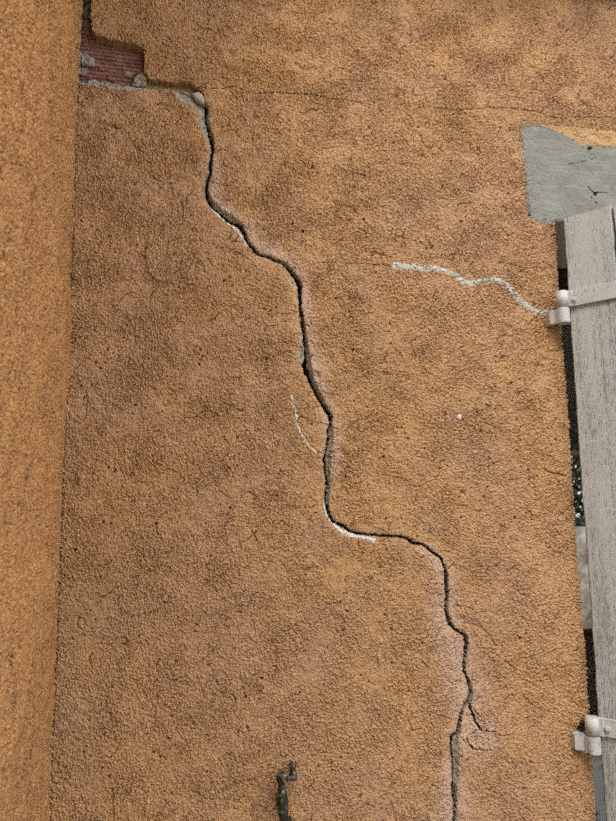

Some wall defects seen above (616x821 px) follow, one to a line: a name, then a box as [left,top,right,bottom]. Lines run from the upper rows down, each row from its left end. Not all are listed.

spalling [78,0,208,143]
crack [197,85,507,821]